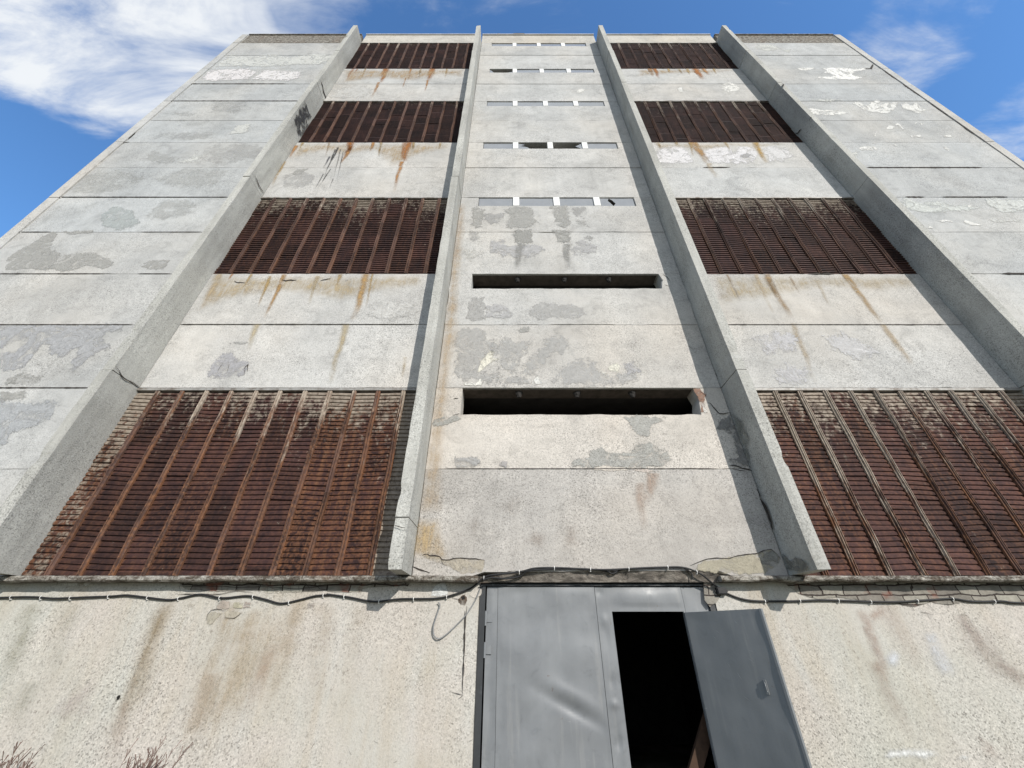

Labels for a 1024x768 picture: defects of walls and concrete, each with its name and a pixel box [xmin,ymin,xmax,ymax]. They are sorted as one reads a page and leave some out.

peeling [5,206,140,272]
peeling [464,206,544,258]
peeling [550,205,589,228]
corrosion [208,274,288,304]
corrosion [303,274,387,305]
corrosion [727,274,786,307]
peeling [454,297,642,386]
peeling [0,323,123,445]
peeling [572,415,672,472]
crack [730,465,773,530]